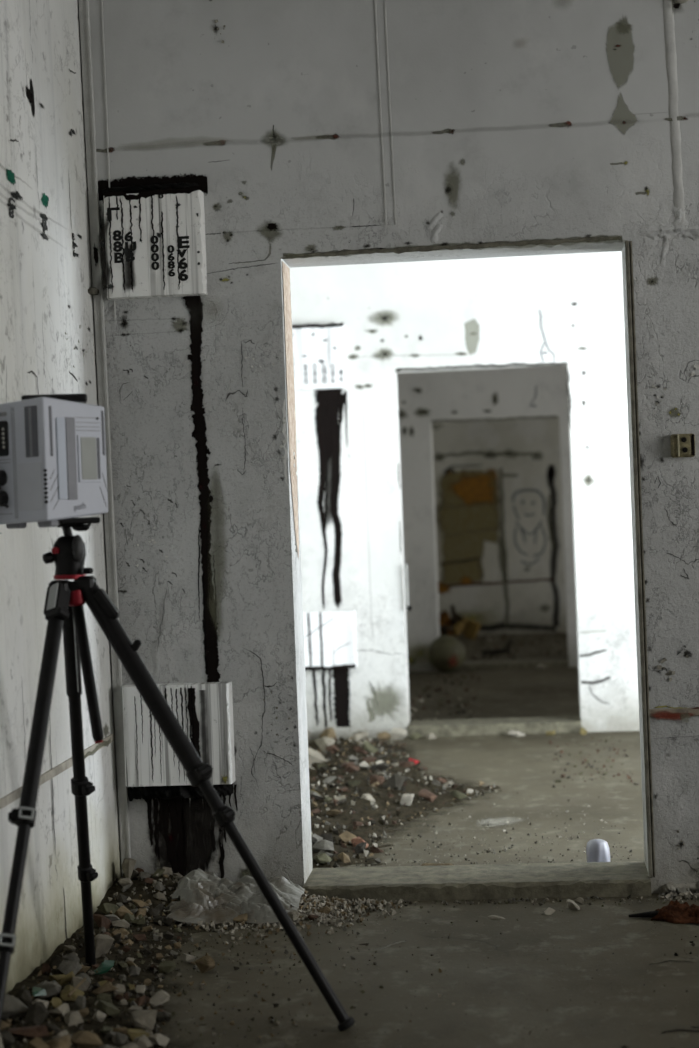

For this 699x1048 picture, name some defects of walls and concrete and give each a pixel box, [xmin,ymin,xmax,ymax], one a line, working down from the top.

water stain [219,223,622,283]
water stain [368,312,394,359]
water stain [396,319,585,436]
water stain [164,296,223,764]
water stain [314,384,372,609]
water stain [438,465,560,634]
water stain [305,664,356,728]
rust [653,705,699,723]
water stain [128,695,238,878]